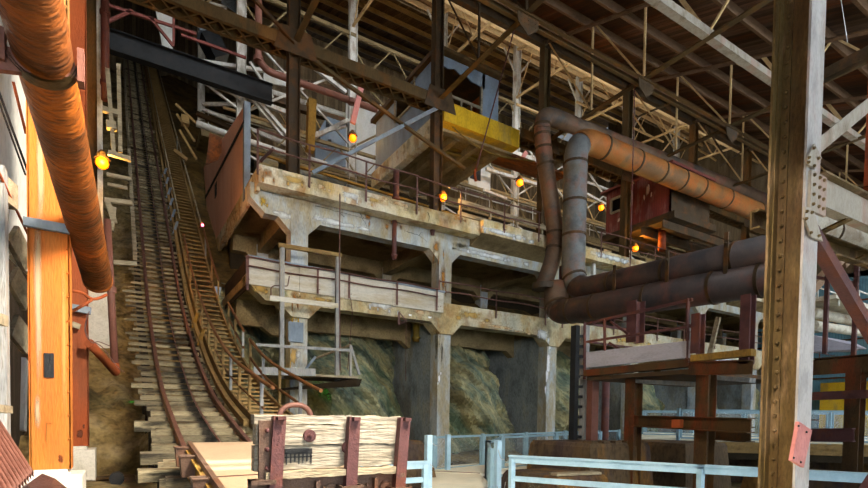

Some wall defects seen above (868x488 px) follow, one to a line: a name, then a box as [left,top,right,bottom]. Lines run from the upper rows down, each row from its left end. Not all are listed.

efflorescence [315,217,369,231]